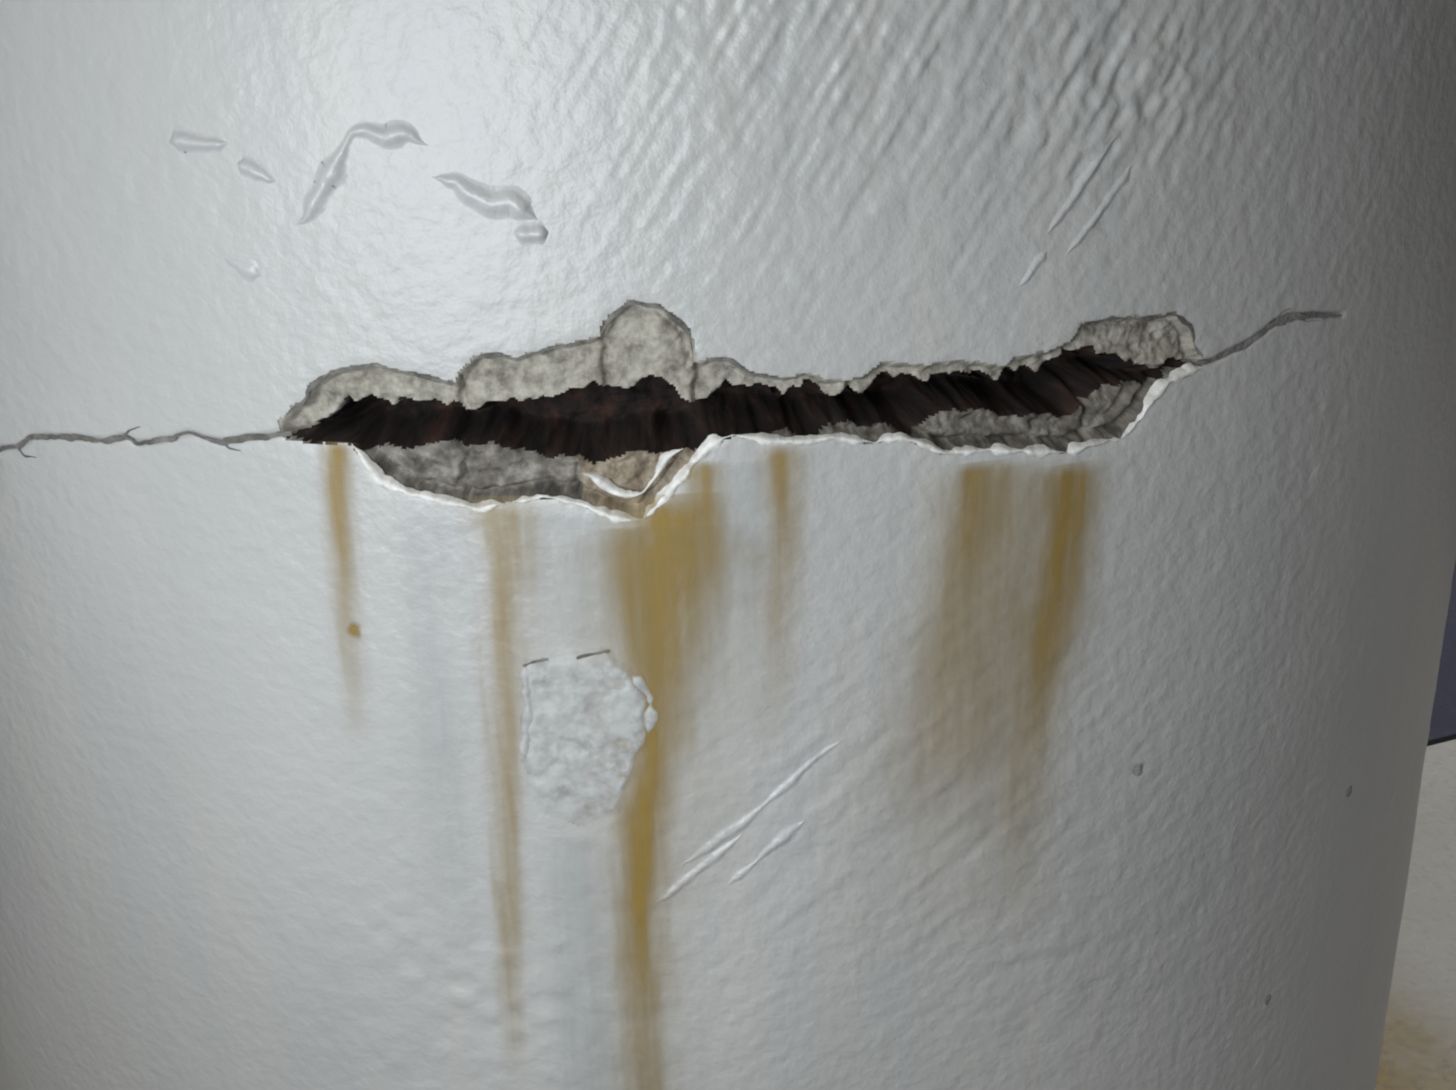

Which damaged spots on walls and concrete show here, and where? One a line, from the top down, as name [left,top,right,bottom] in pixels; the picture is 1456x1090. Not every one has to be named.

crack [1196,308,1342,365]
crack [0,426,292,458]
spalling [276,299,1206,524]
rust [329,446,345,563]
rust [961,468,989,571]
rust [1032,469,1086,704]
rust [625,466,711,999]